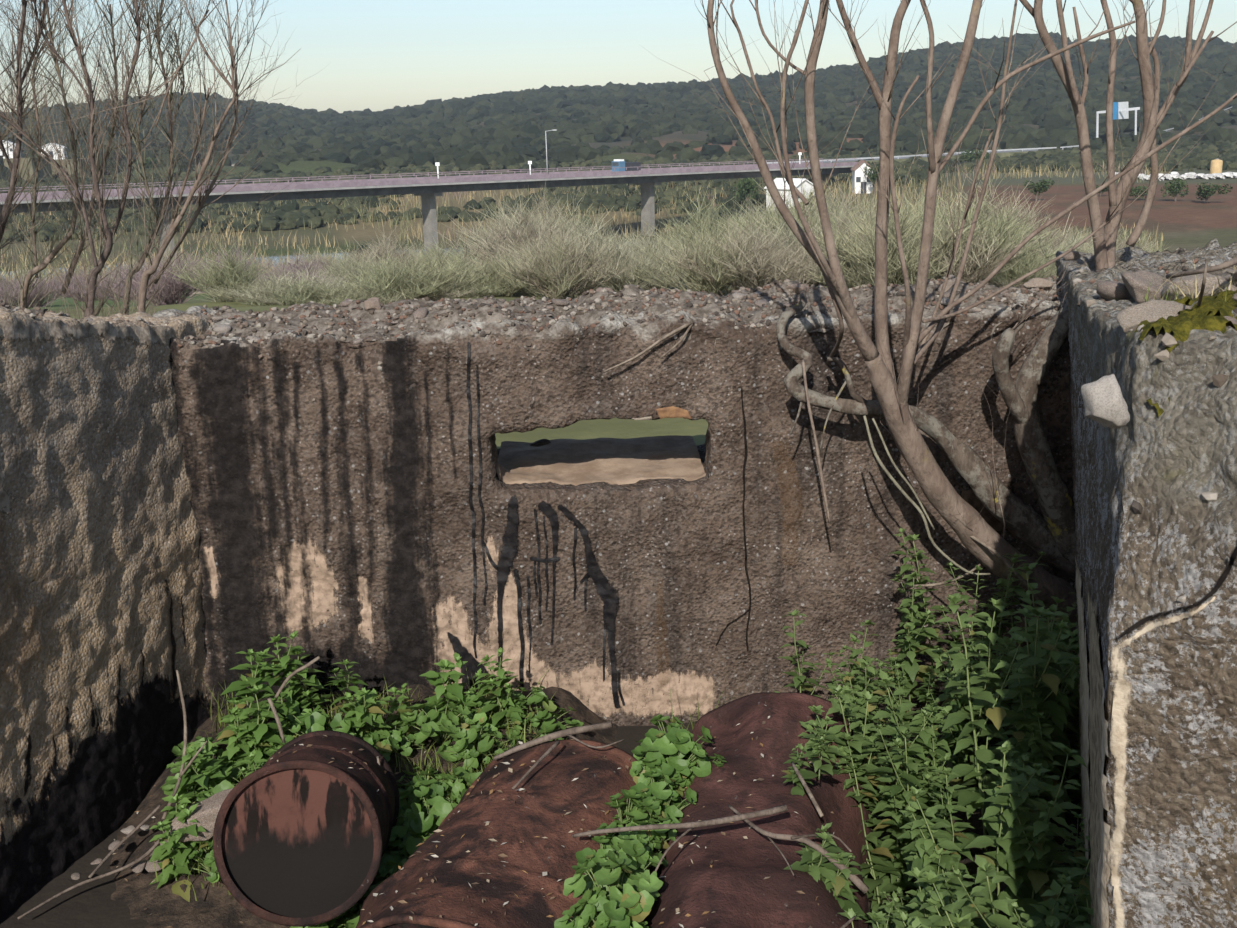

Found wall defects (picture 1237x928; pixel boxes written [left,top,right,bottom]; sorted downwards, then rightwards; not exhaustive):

water stain [24,735,32,796]
water stain [51,707,74,777]
water stain [165,579,187,691]
water stain [169,335,440,713]
water stain [446,342,497,658]
water stain [514,509,591,691]
water stain [603,606,625,706]
crack [716,388,751,651]
spalling [1075,556,1216,928]
crack [1116,546,1237,640]